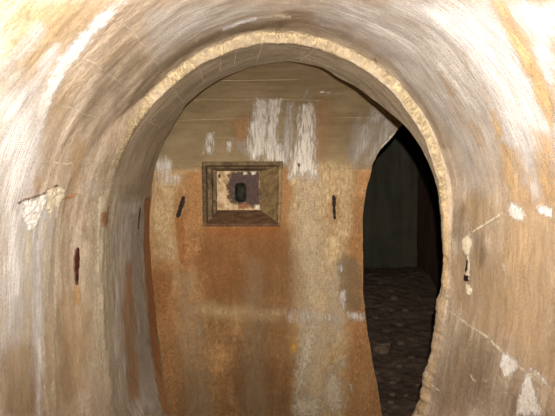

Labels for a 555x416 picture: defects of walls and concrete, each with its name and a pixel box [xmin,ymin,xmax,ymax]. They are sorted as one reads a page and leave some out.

leakage [136,0,555,217]
peeling [22,187,66,230]
corrosion [175,171,204,262]
spalling [112,30,472,318]
leakage [247,98,394,416]
crack [469,214,501,236]
crack [451,312,506,355]